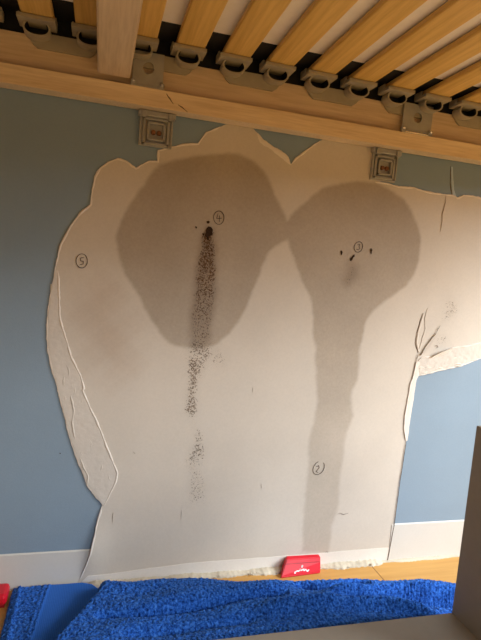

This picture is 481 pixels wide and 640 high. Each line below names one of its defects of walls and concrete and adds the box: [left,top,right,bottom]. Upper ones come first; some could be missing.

water stain [50,149,424,555]
peeling [46,124,481,588]
crack [412,308,440,379]